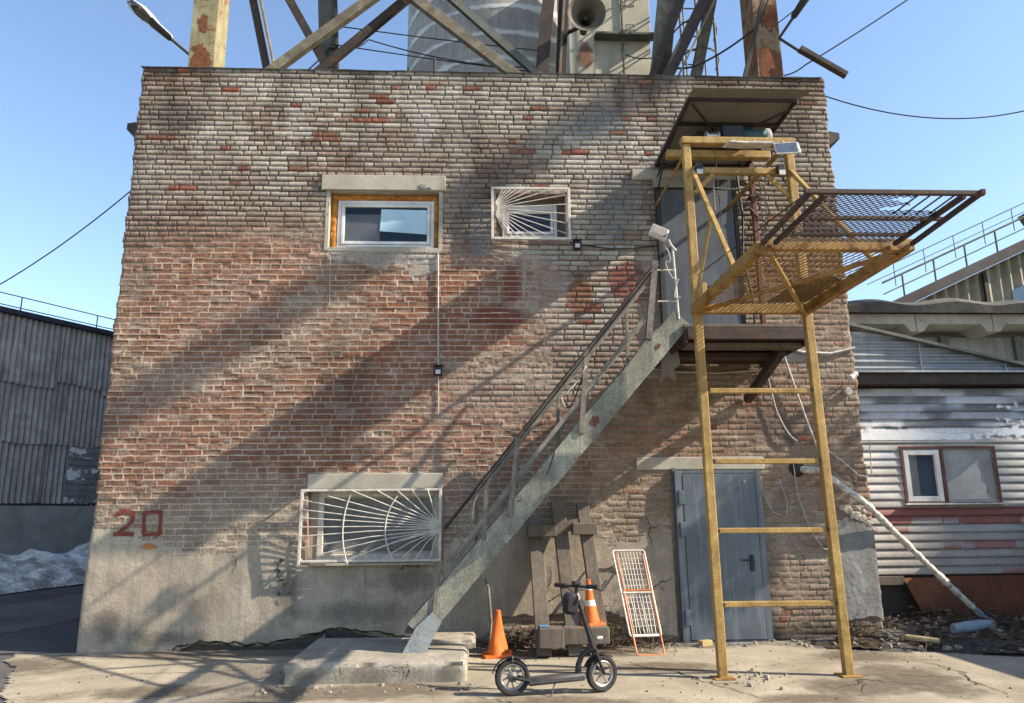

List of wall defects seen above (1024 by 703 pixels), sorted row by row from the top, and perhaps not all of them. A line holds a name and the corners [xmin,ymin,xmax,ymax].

rust [755,3,778,33]
rust [190,14,211,67]
rust [760,47,782,77]
peeling [861,401,1024,440]
peeling [66,447,100,502]